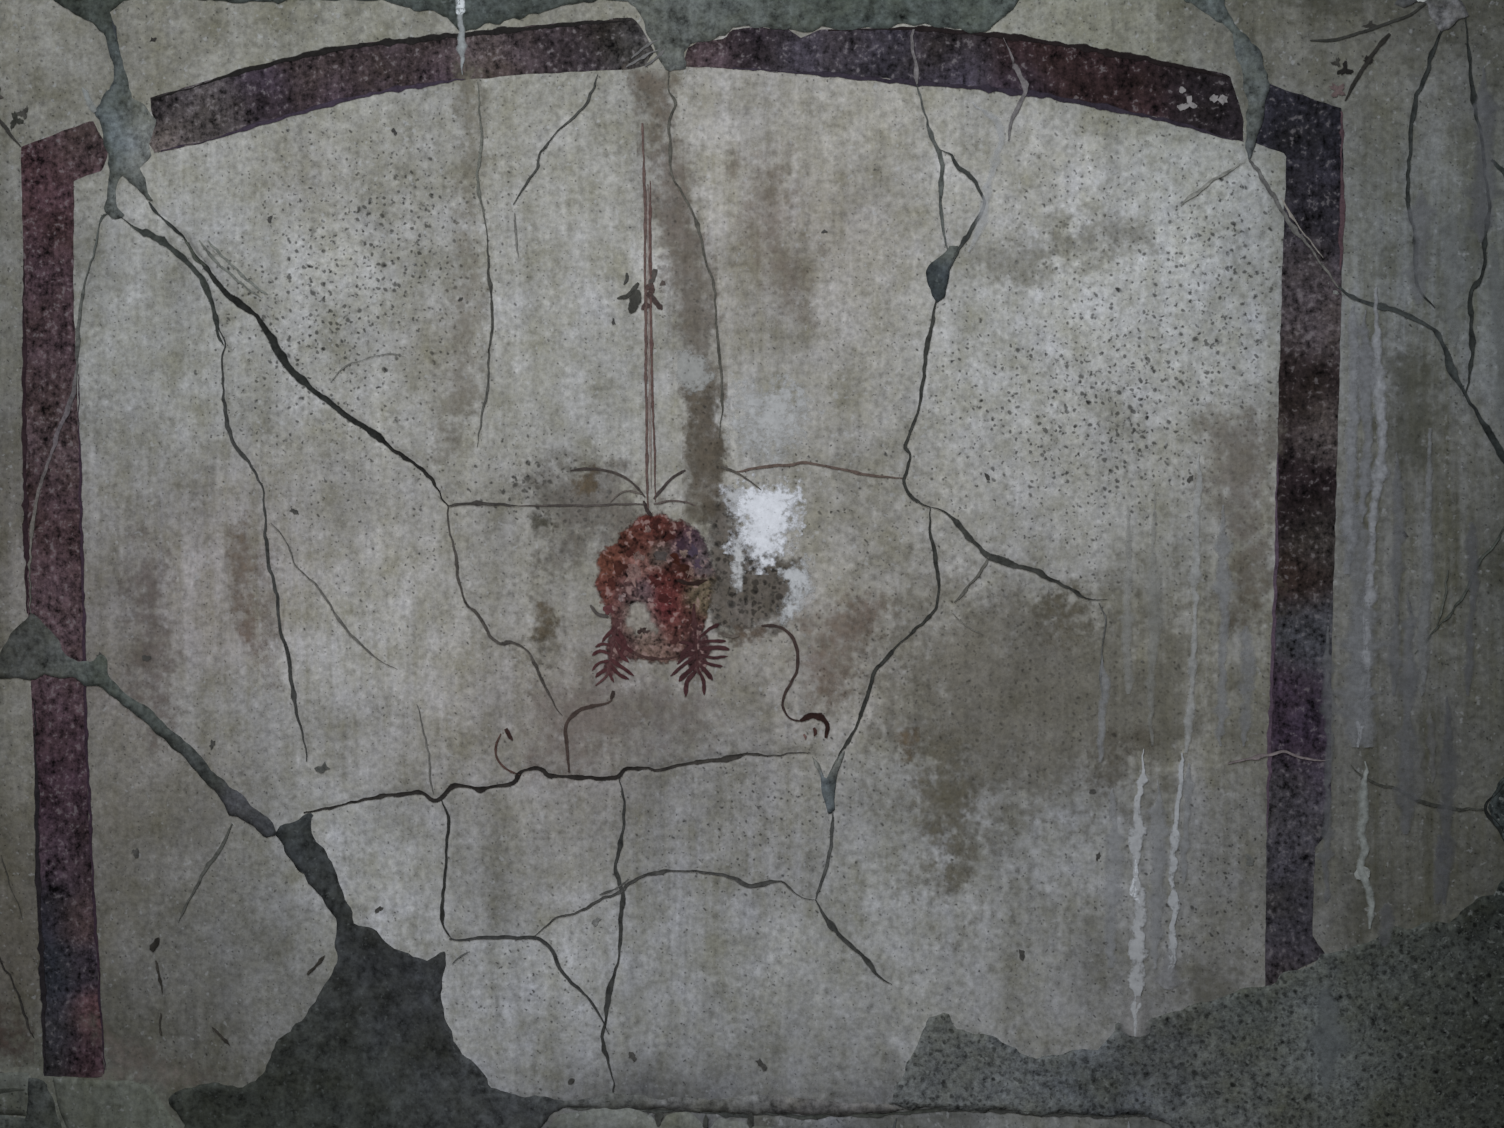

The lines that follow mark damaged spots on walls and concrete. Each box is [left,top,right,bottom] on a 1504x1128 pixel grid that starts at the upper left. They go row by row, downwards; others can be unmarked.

crack [150,823,233,1035]
crack [27,202,562,762]
crack [476,74,598,446]
crack [667,72,723,438]
leakage [634,72,813,641]
crack [304,298,1147,1128]
crack [910,29,986,257]
crack [1003,38,1029,141]
leakage [869,415,1273,1037]
crack [1180,17,1504,464]
crack [1227,750,1504,840]
crack [1415,527,1504,654]